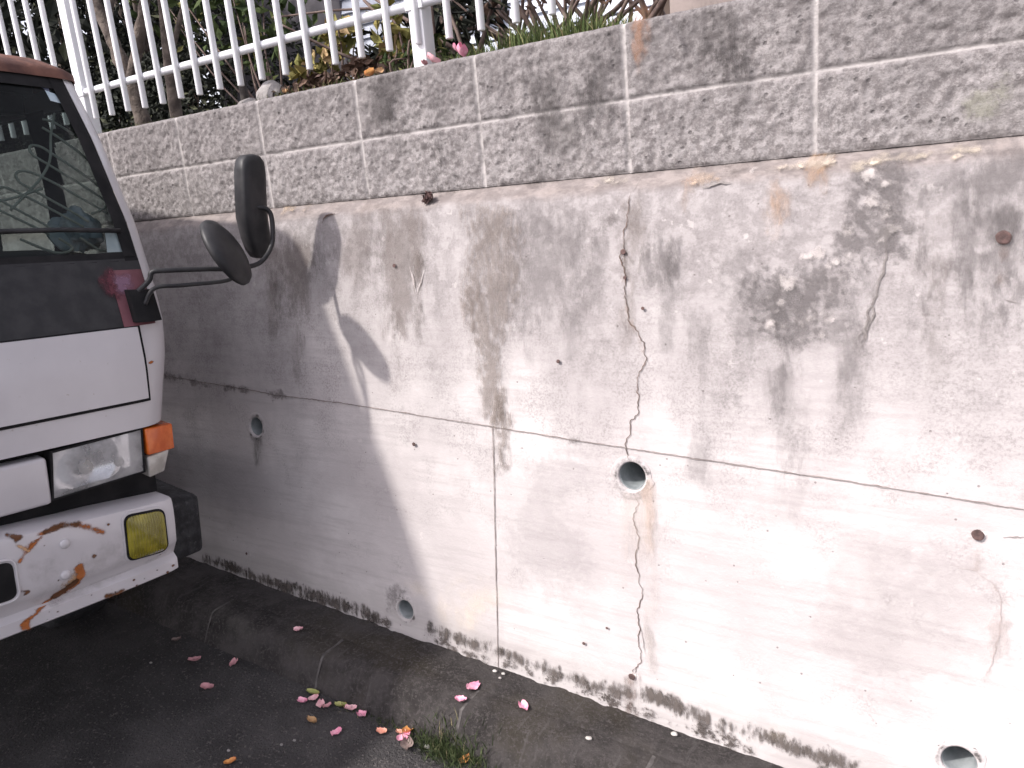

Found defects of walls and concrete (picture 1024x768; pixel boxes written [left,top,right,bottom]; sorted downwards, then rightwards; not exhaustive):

crack [619,177,647,462]
water stain [739,158,912,345]
crack [858,229,897,345]
crack [632,497,646,672]